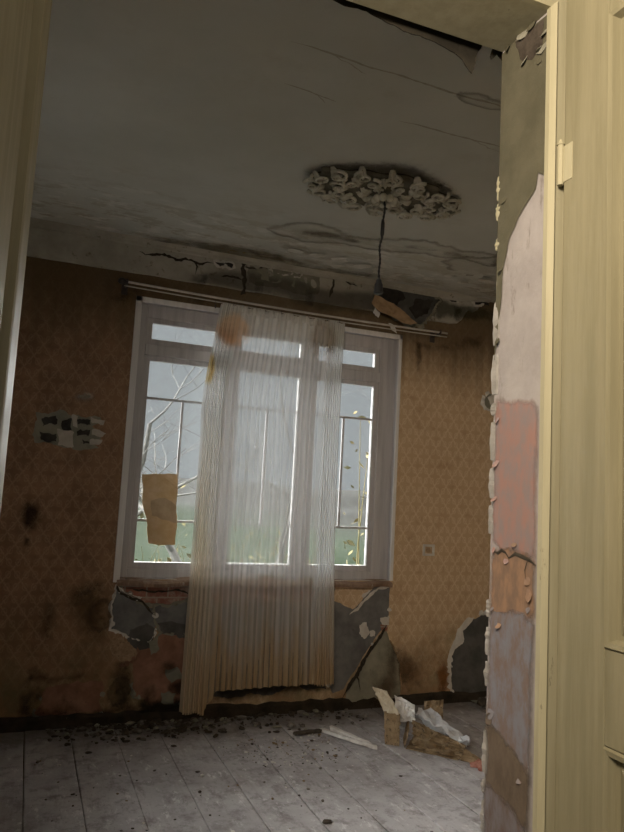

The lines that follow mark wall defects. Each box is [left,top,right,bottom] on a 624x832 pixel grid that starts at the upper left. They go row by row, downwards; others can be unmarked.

crack [285,41,501,107]
crack [139,251,211,274]
leakage [159,240,284,262]
crack [229,264,268,295]
leakage [195,273,375,312]
leakage [435,301,493,319]
peeling [57,414,78,448]
peeling [411,15,547,832]
spalling [108,577,392,704]